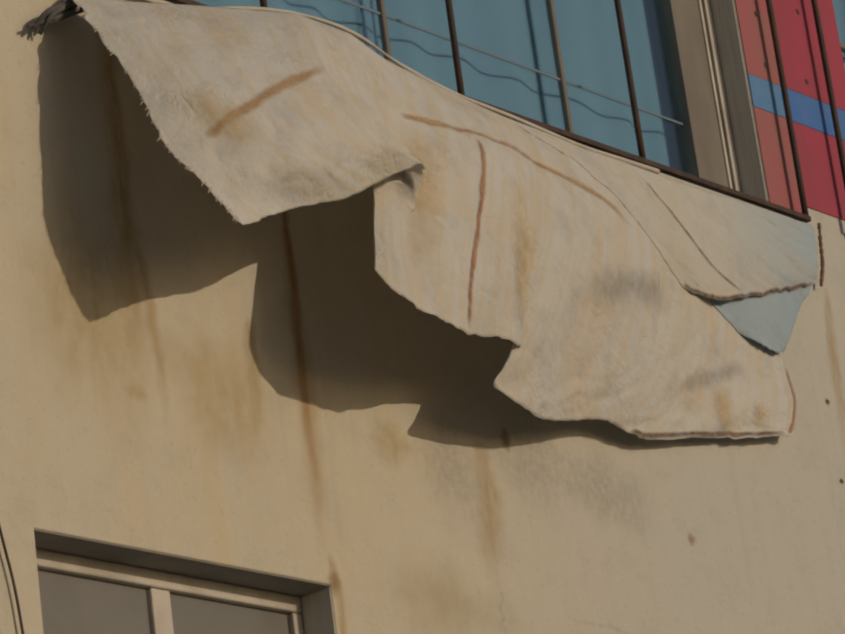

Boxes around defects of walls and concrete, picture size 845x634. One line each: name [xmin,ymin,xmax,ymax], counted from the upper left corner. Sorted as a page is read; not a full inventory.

corrosion [817,223,825,287]